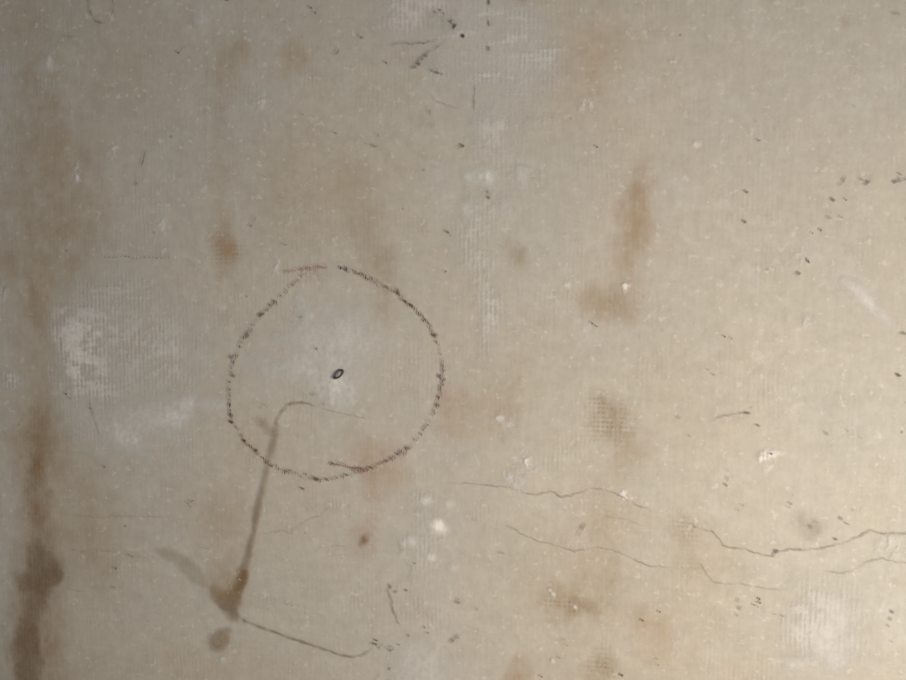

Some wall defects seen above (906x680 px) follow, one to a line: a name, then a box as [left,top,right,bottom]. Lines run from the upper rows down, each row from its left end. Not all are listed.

leakage [219,501,260,614]